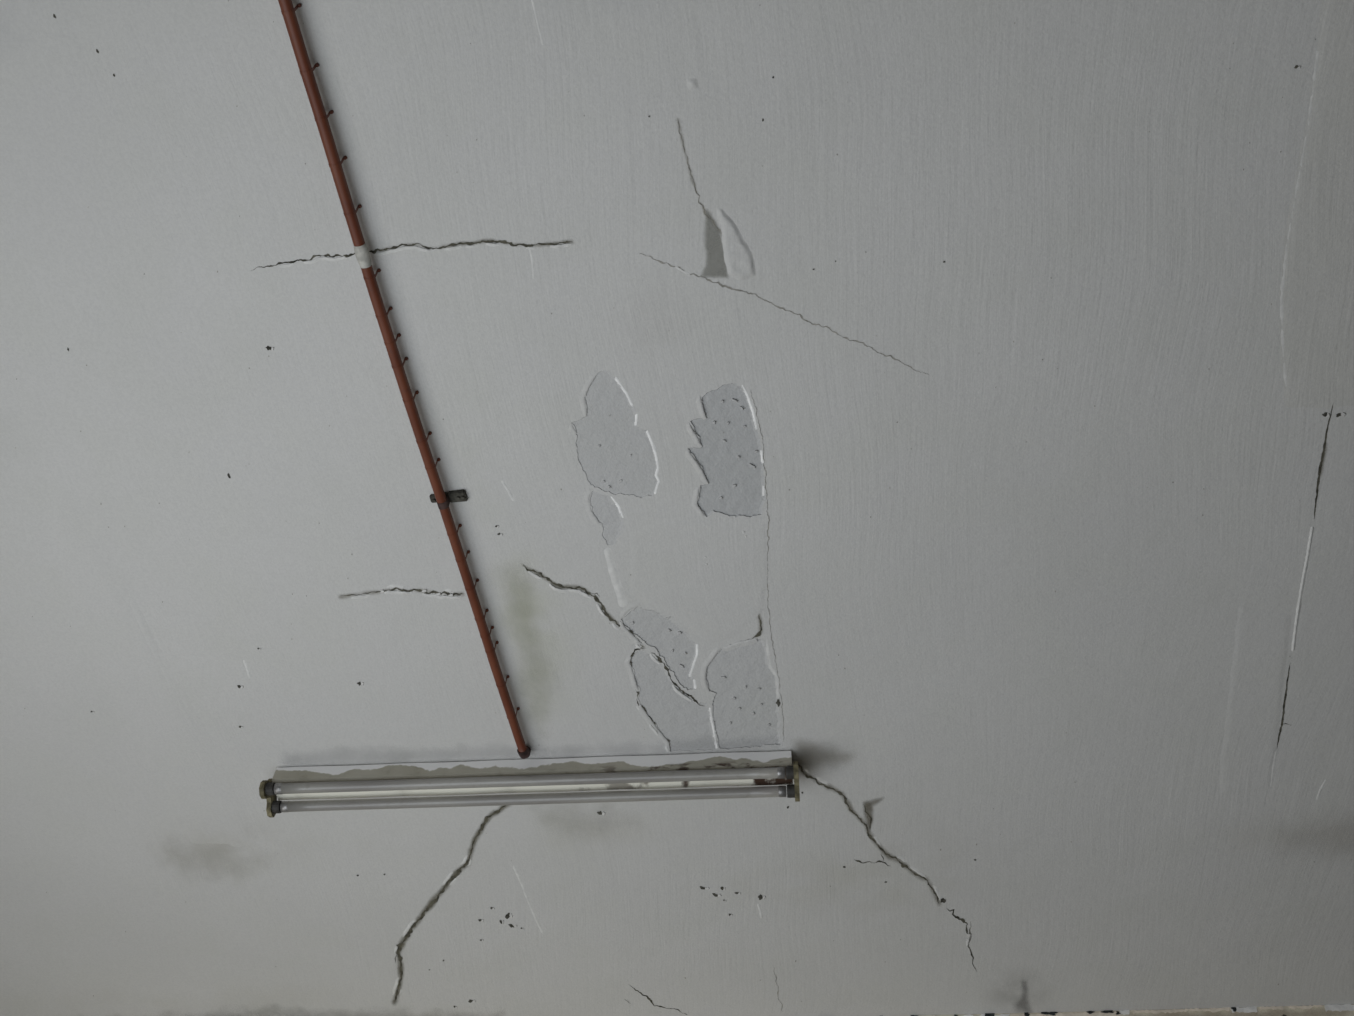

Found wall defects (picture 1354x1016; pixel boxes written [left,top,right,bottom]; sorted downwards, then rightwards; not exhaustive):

crack [678,123,722,234]
crack [254,240,572,270]
crack [640,253,929,375]
peeling [569,370,660,545]
peeling [685,383,766,518]
crack [344,584,463,600]
crack [525,567,702,752]
peeling [618,602,782,752]
crack [1270,405,1333,787]
crack [392,805,508,1002]
crack [798,764,976,969]